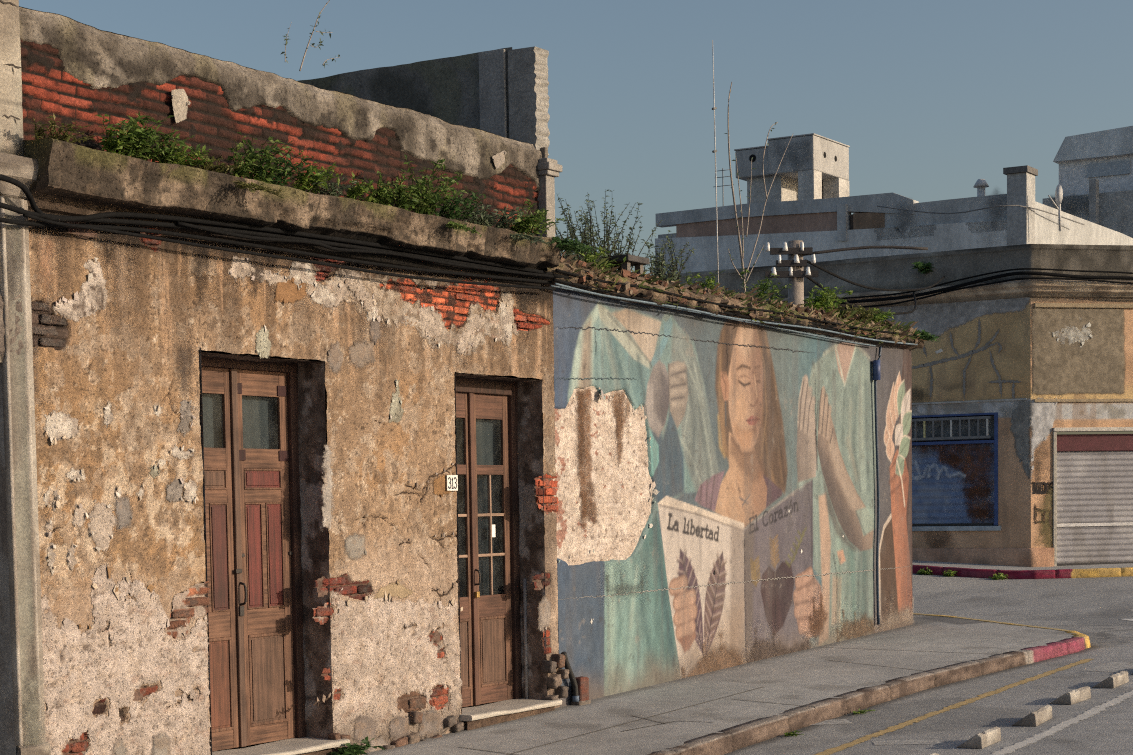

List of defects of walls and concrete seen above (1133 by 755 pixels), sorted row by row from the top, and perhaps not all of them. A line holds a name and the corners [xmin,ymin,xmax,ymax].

spalling [20,39,539,236]
spalling [140,228,161,252]
peeling [31,255,108,350]
peeling [228,255,550,359]
flaking render [879,297,1030,354]
spalling [534,386,660,565]
corrosion [920,440,994,523]
flaking render [1010,398,1058,479]
peeling [41,485,211,755]
peeling [312,573,464,755]
spalling [532,573,550,590]